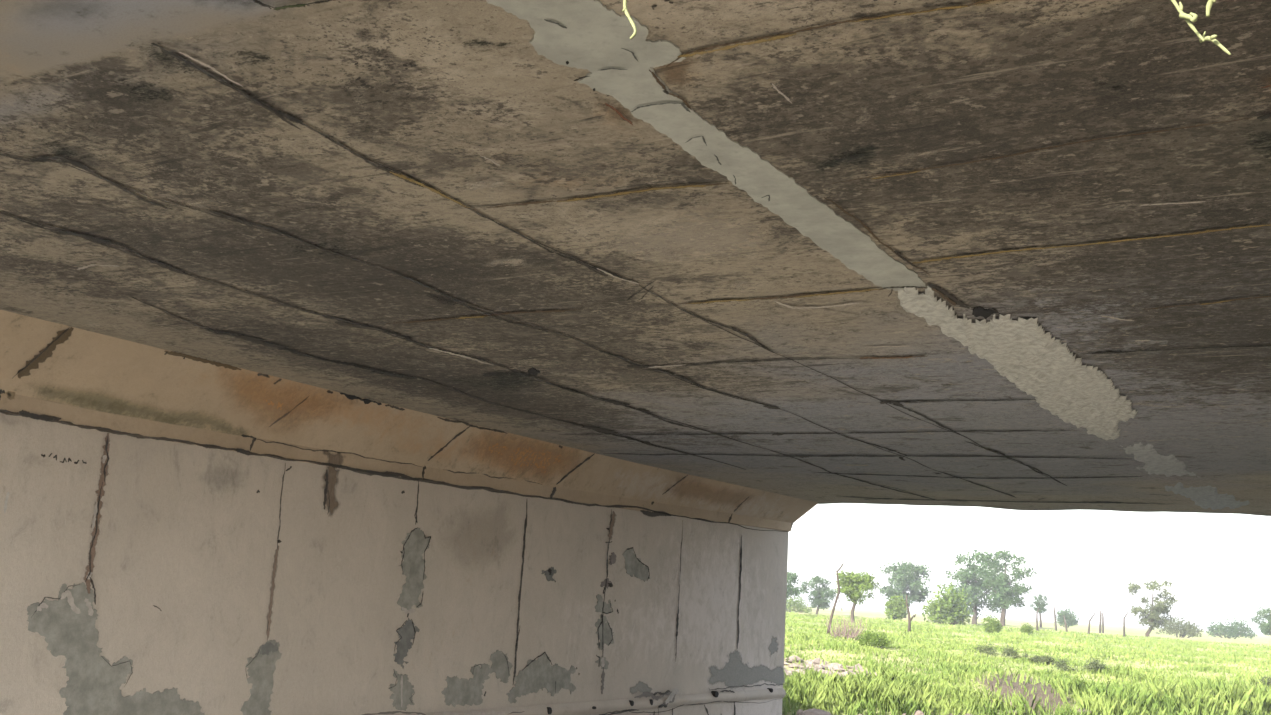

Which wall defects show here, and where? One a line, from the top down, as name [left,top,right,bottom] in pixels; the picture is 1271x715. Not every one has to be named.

water stain [214,51,273,64]
crack [151,0,994,301]
crack [309,271,570,365]
crack [599,118,1271,409]
crack [0,327,1163,715]
flaking render [27,582,205,715]
flaking render [240,640,282,715]
flaking render [388,528,431,711]
flaking render [441,650,580,707]
flaking render [594,547,650,670]